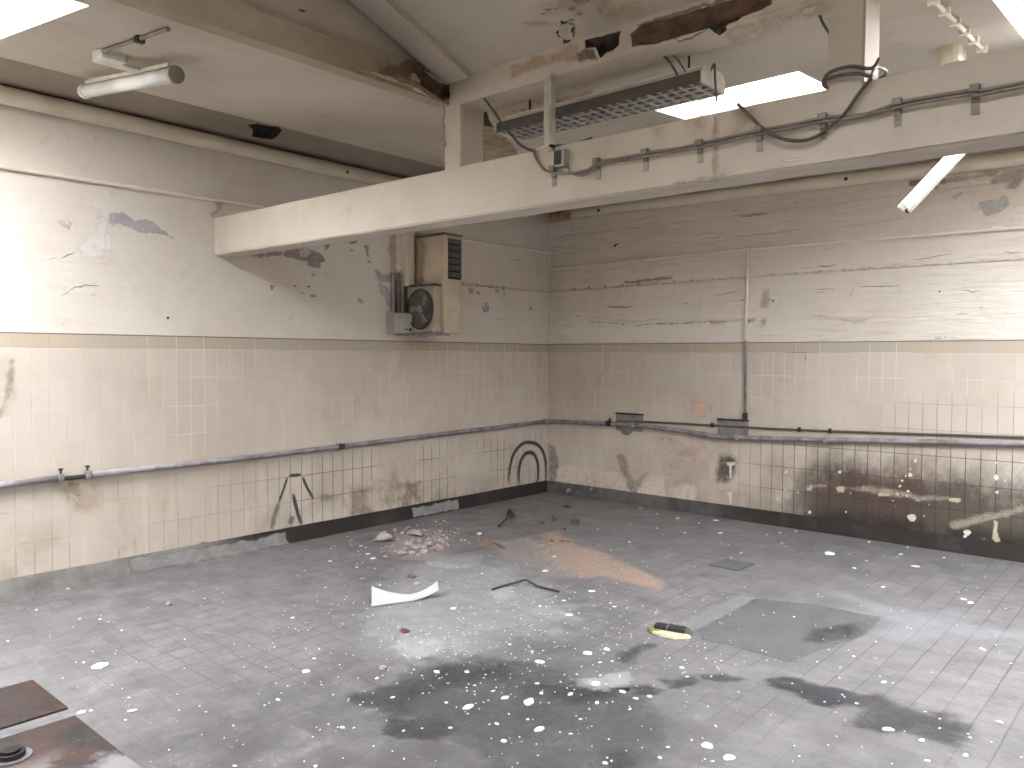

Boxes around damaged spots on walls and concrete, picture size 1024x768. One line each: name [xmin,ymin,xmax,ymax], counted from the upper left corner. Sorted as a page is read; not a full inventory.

spalling [556,0,772,61]
spalling [357,59,450,101]
peeling [109,211,173,239]
peeling [979,195,1009,216]
peeling [254,244,330,297]